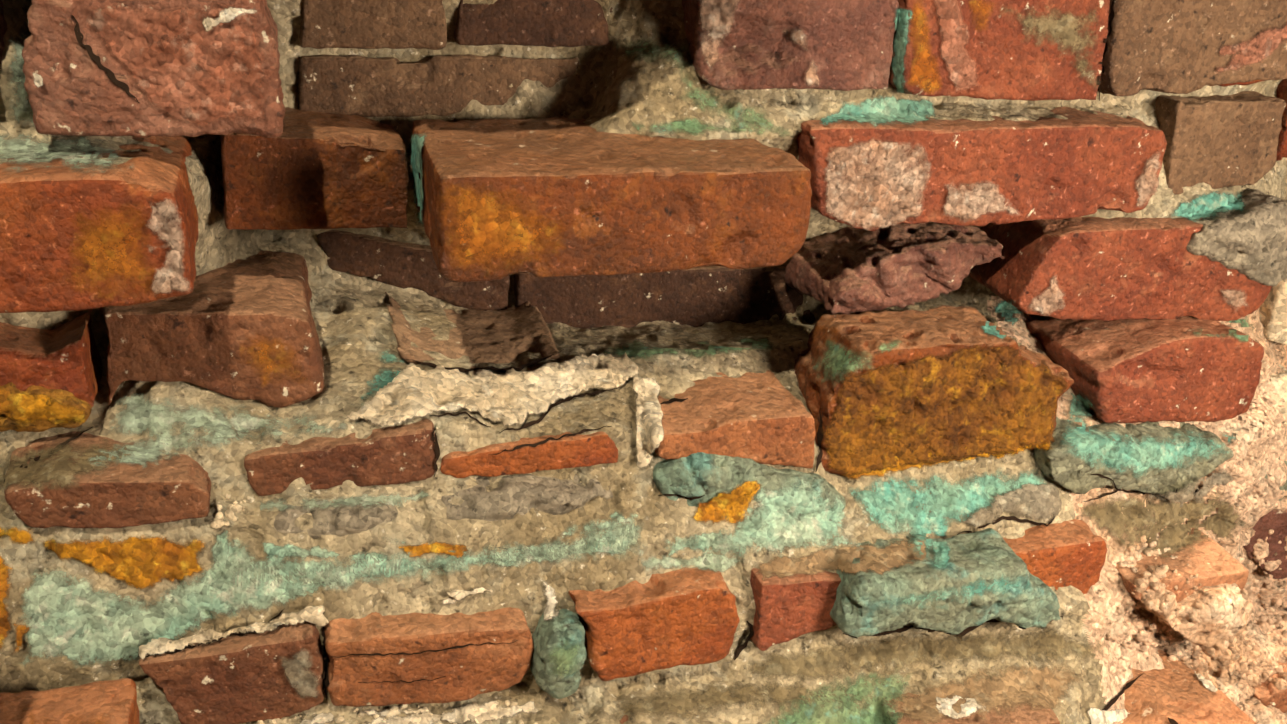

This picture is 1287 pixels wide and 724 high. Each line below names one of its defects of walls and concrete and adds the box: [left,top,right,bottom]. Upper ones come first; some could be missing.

crack [72,15,139,103]
peeling [346,352,664,468]
peeling [963,484,1062,527]
peeling [1150,470,1233,507]